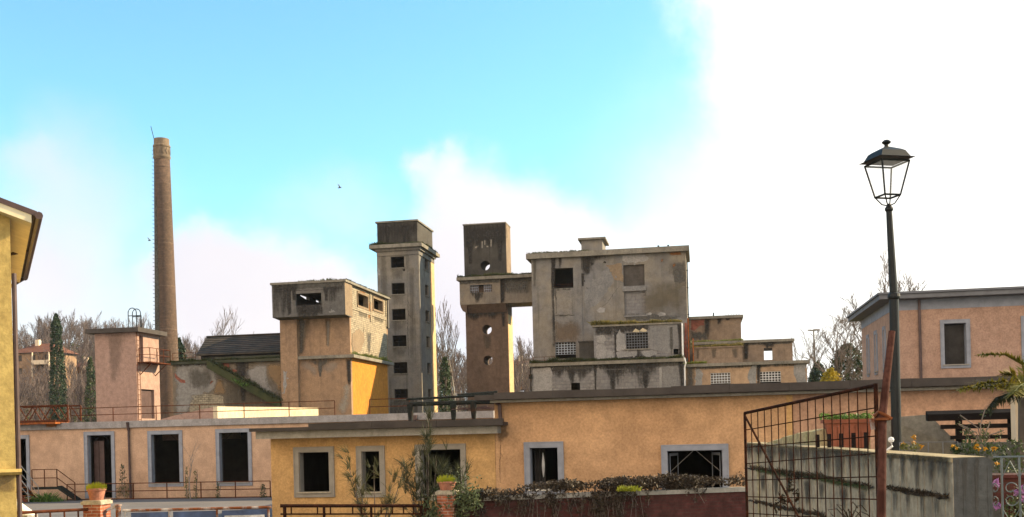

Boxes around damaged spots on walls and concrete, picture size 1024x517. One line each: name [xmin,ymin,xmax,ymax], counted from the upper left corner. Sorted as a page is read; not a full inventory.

water stain [581,256,603,286]
water stain [273,284,339,353]
water stain [533,314,802,389]
flaking render [175,363,289,414]